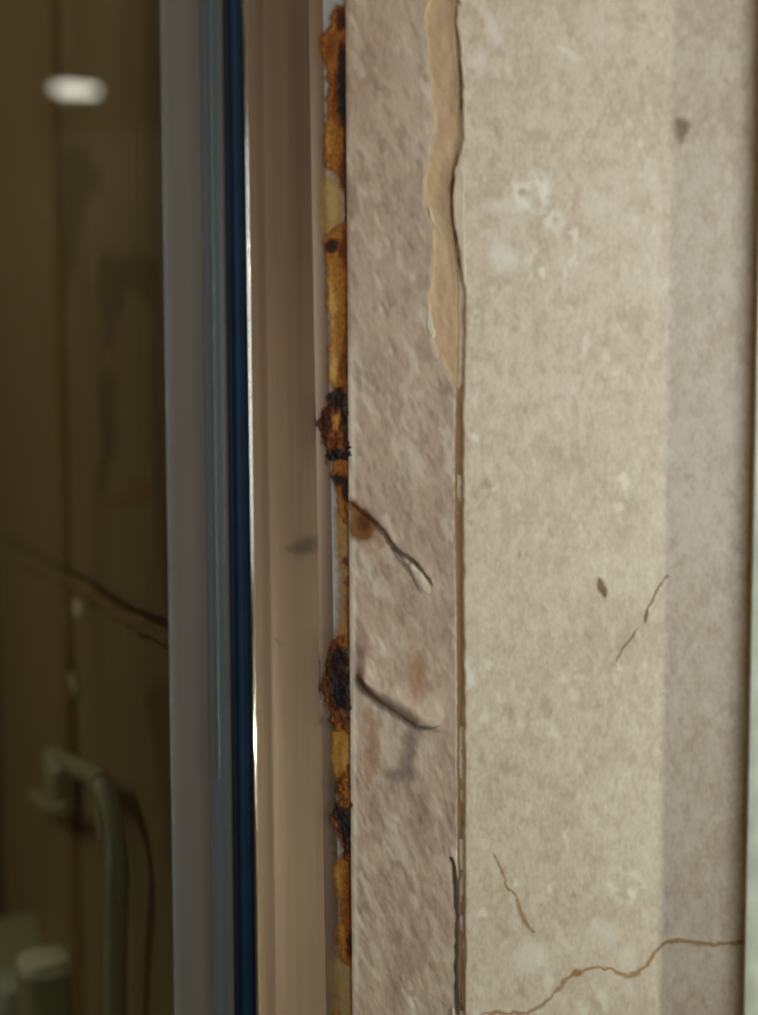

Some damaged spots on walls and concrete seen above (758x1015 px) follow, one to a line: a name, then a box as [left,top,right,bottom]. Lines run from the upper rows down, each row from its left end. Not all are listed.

spalling [422,0,467,390]
rust [315,4,377,1015]
crack [352,501,433,594]
crack [616,575,669,661]
crack [356,675,438,730]